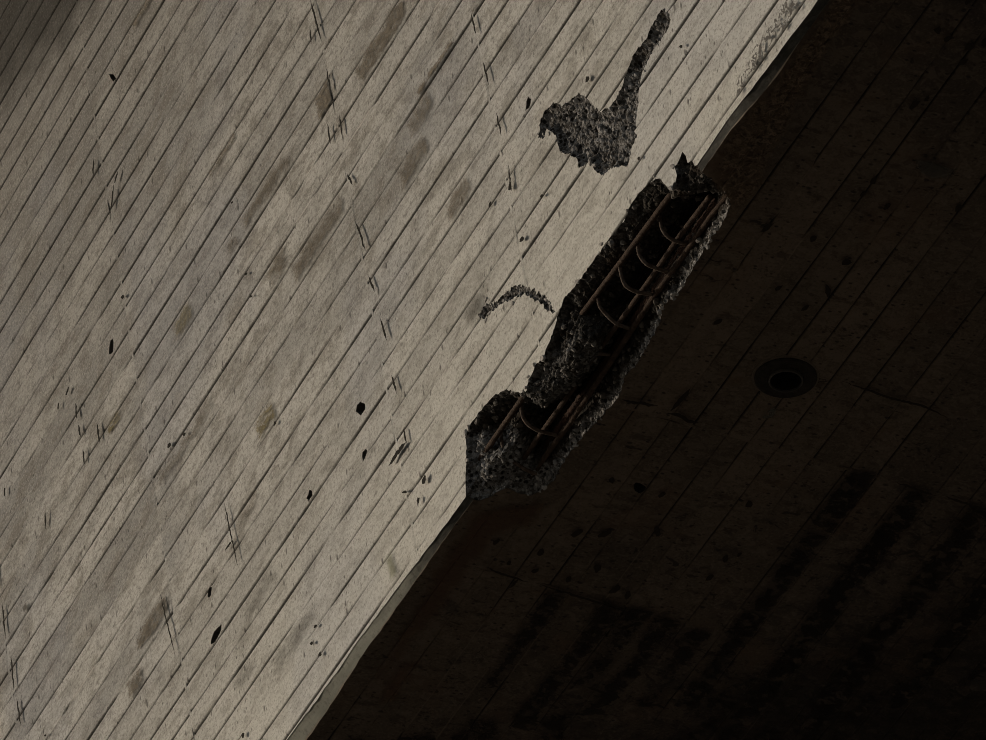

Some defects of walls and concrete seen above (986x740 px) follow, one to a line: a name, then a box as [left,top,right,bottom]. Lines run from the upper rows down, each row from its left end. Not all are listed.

spalling [537,8,671,175]
spalling [464,152,731,500]